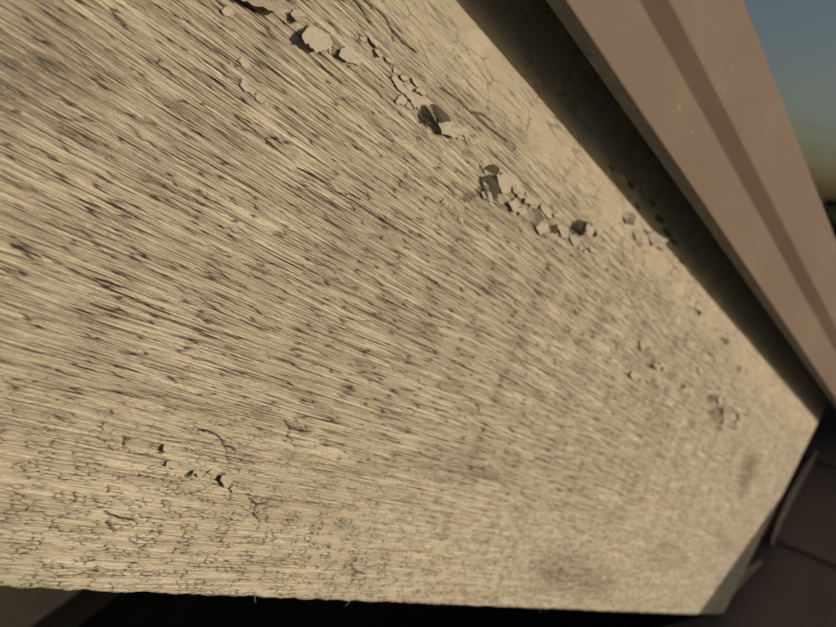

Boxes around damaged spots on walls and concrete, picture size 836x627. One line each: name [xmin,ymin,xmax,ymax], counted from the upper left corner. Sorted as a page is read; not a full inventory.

peeling [242,0,362,66]
crack [354,0,415,52]
peeling [230,57,268,108]
crack [440,88,504,140]
peeling [359,36,606,265]
peeling [608,165,677,251]
peeling [183,468,249,494]